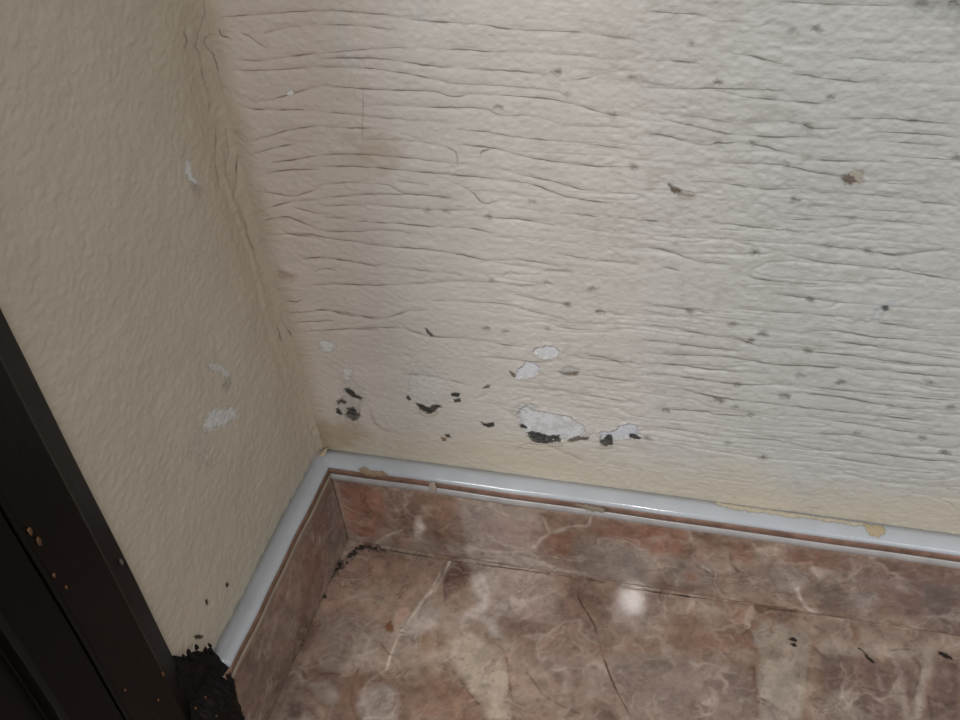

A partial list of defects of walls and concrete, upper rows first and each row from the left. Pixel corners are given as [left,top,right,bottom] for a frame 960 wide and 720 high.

crack [339,51,448,108]
crack [255,91,307,171]
crack [873,118,936,135]
crack [273,193,348,261]
crack [367,157,430,247]
spalling [336,367,365,421]
peeling [406,396,441,417]
peeling [509,346,560,379]
peeling [561,366,578,375]
peeling [512,403,641,449]
crack [658,309,940,432]